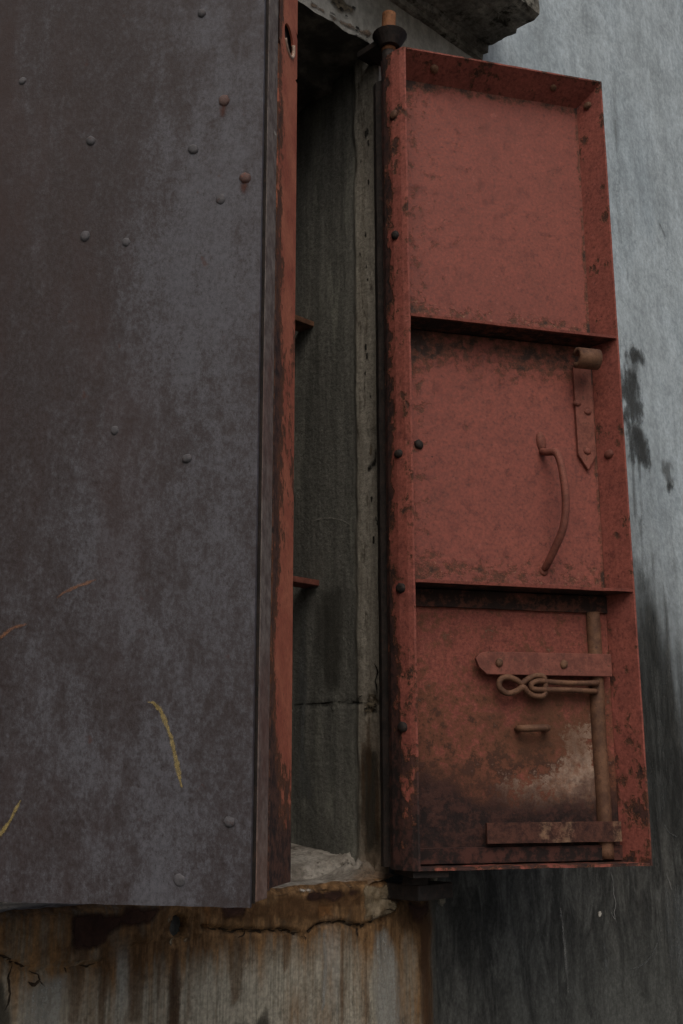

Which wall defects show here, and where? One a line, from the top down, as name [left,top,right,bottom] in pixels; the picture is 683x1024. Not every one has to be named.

leakage [621,347,650,466]
mould [663,465,673,492]
corrosion [72,907,160,949]
corrosion [203,890,362,925]
crack [200,917,382,940]
corrosion [169,949,180,1024]